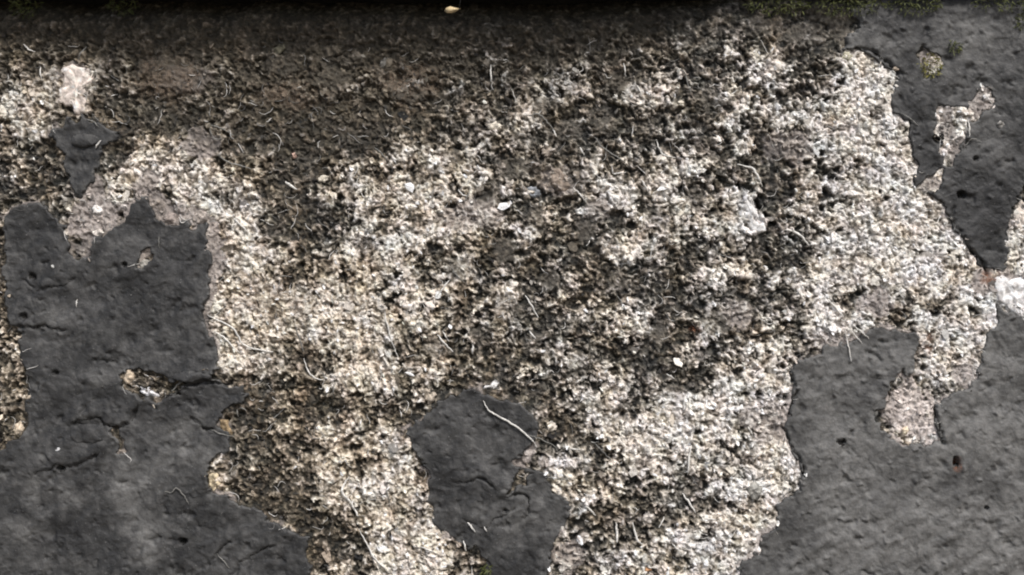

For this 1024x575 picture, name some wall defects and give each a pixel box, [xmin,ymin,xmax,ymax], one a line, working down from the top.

spalling [916,46,943,79]
spalling [122,237,159,269]
spalling [120,368,186,409]